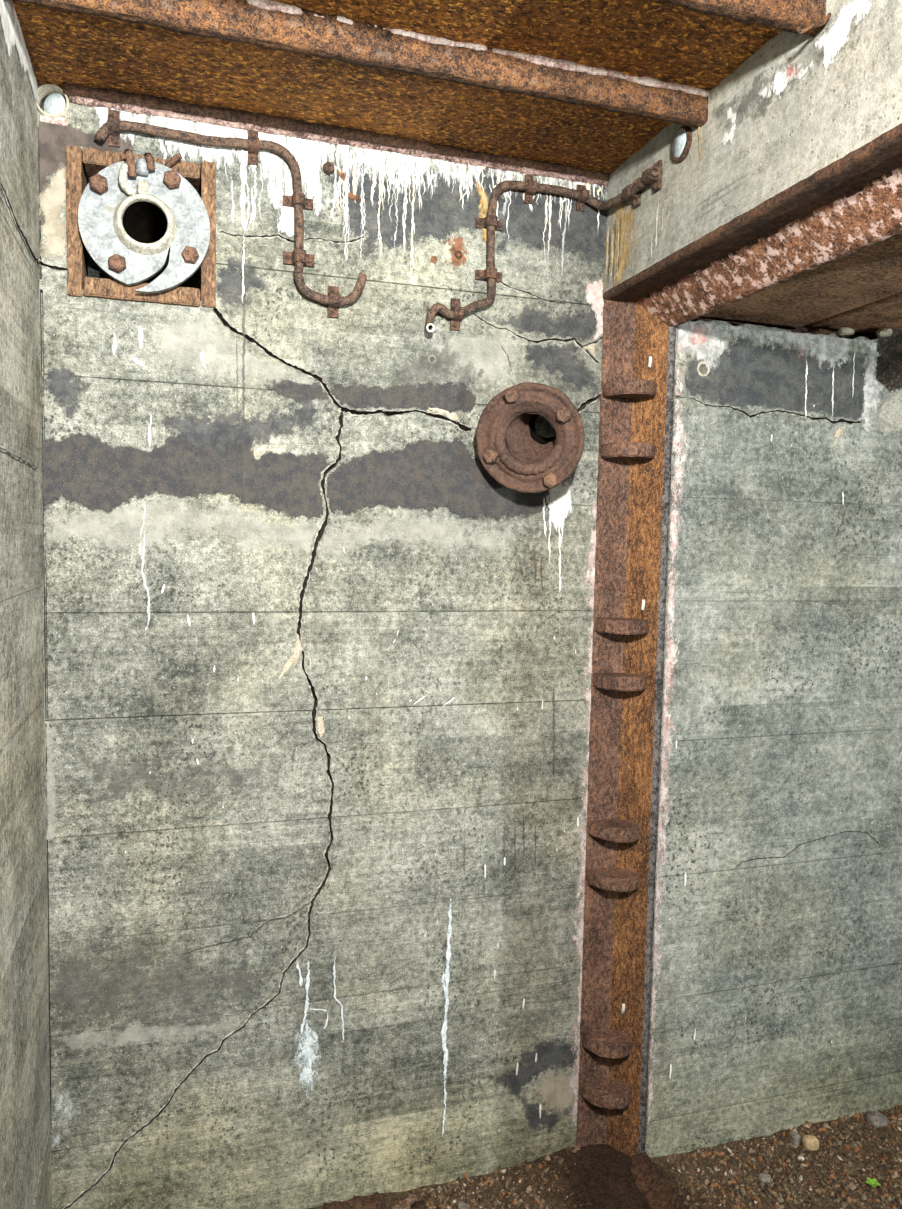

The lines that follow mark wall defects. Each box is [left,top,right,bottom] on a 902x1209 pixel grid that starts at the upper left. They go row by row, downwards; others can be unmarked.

crack [0,446,38,469]
water stain [38,96,608,630]
crack [473,314,603,413]
crack [675,396,863,425]
crack [63,307,472,1209]
water stain [489,500,597,1132]
water stain [647,322,870,1144]
water stain [293,952,344,1097]
water stain [437,899,452,1137]